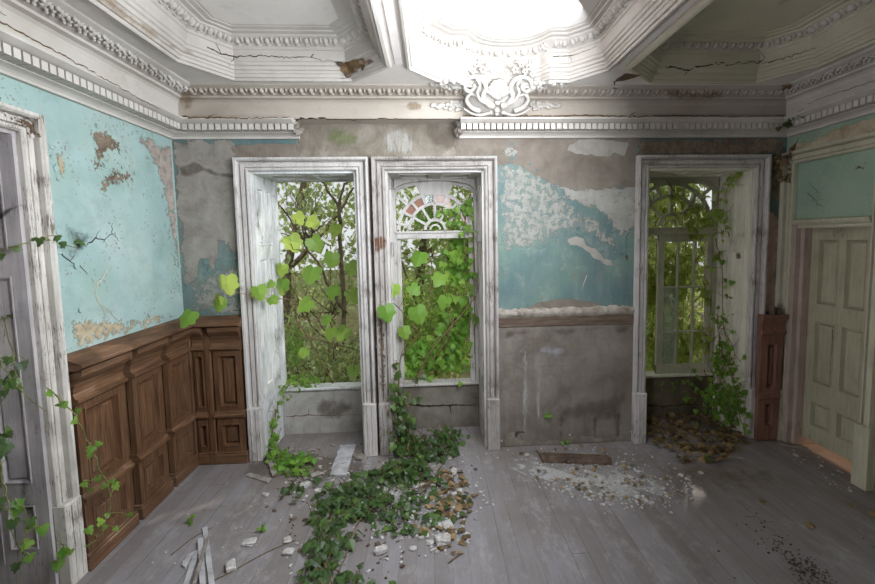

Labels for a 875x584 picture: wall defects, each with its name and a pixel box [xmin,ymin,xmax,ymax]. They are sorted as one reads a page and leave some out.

crack [0,12,158,109]
crack [207,44,335,67]
flaking render [337,58,374,79]
crack [666,48,816,76]
peeling [4,112,41,138]
peeling [90,123,137,200]
flaking render [131,120,785,315]
crack [62,223,118,321]
peeling [66,307,173,350]
crack [407,403,473,413]